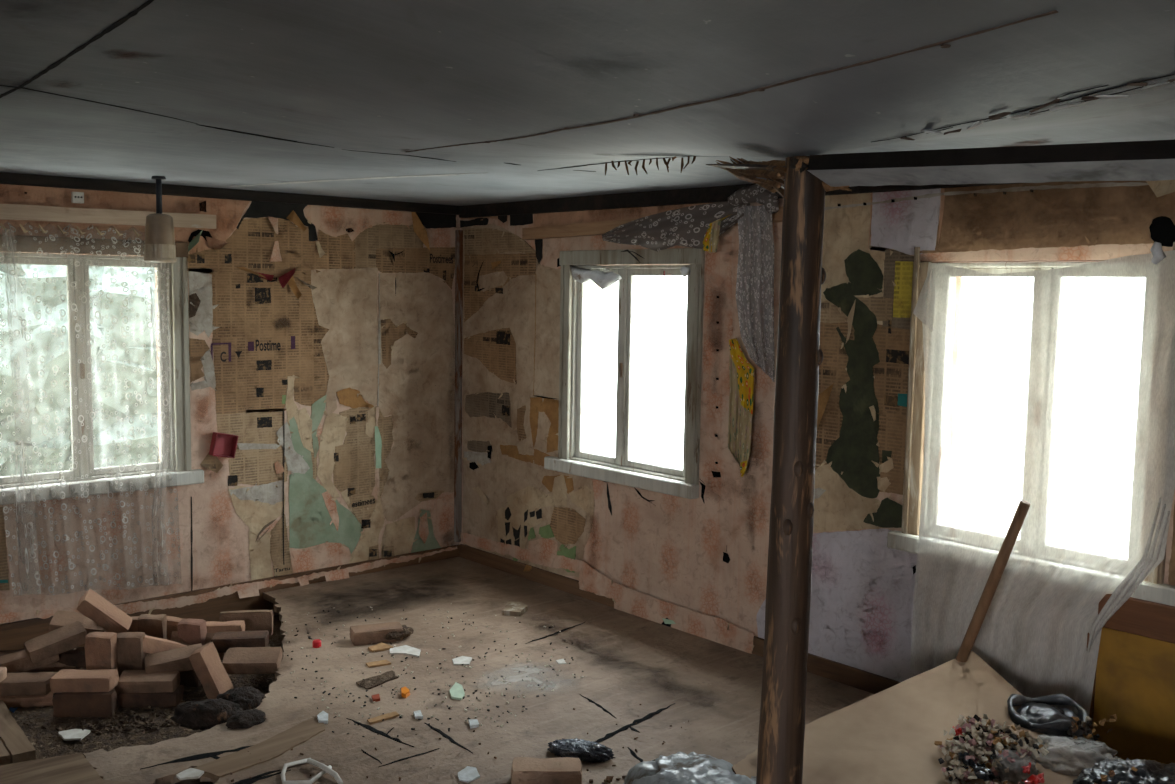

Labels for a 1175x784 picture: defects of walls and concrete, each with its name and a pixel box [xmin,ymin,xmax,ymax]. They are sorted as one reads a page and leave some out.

peeling [1081,78,1175,101]
peeling [200,453,223,473]
peeling [462,445,492,470]
peeling [808,188,941,682]
peeling [290,486,350,573]
peeling [419,493,456,547]
peeling [752,599,766,648]